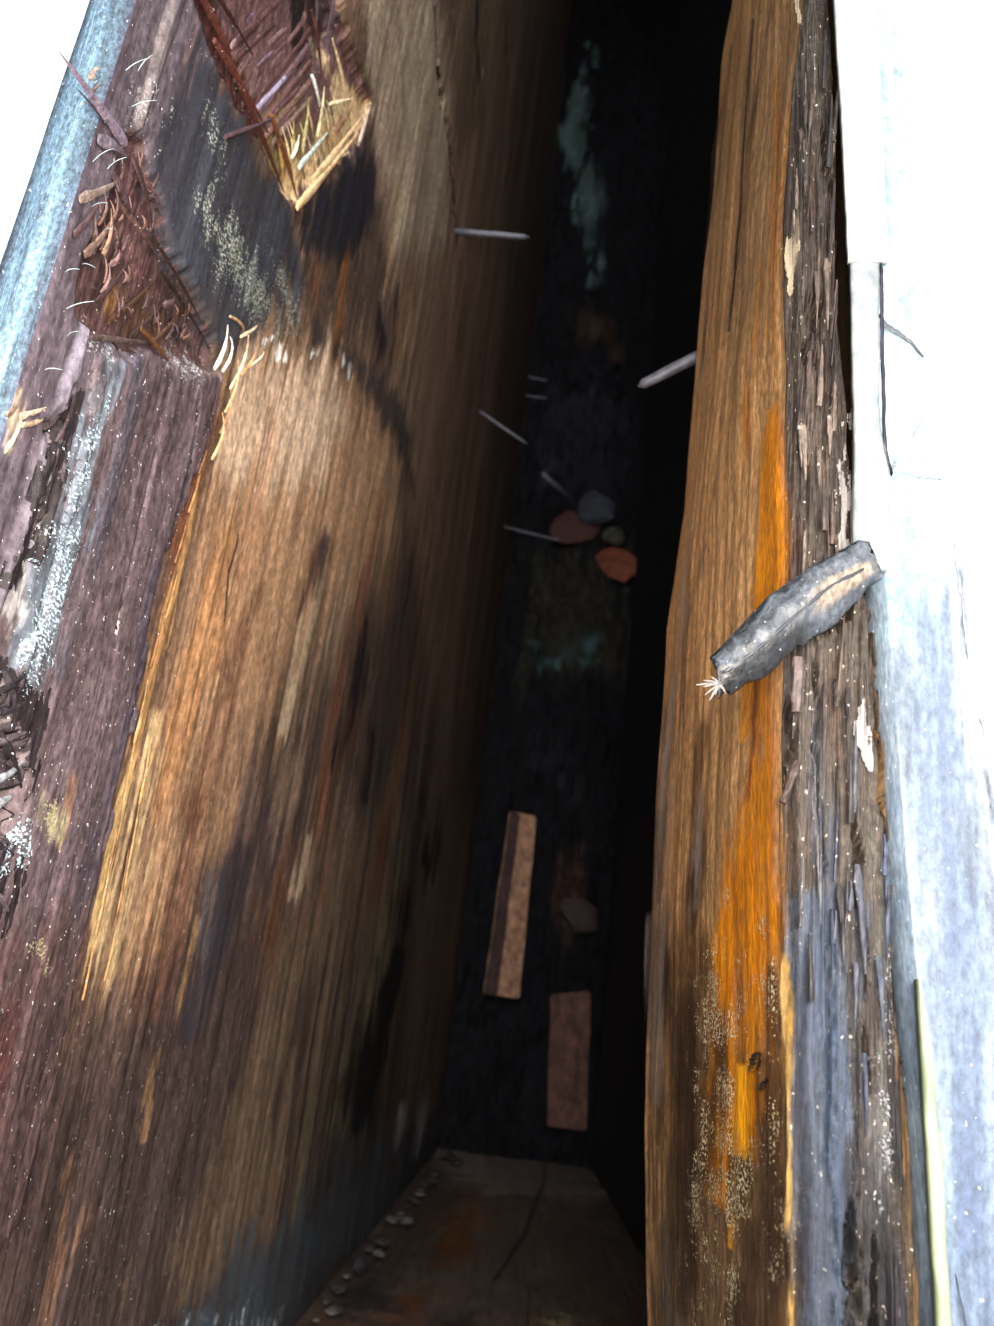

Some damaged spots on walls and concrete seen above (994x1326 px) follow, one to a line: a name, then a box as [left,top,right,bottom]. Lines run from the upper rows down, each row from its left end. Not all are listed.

water stain [139,29,377,365]
crack [433,1,458,240]
water stain [179,818,441,1326]